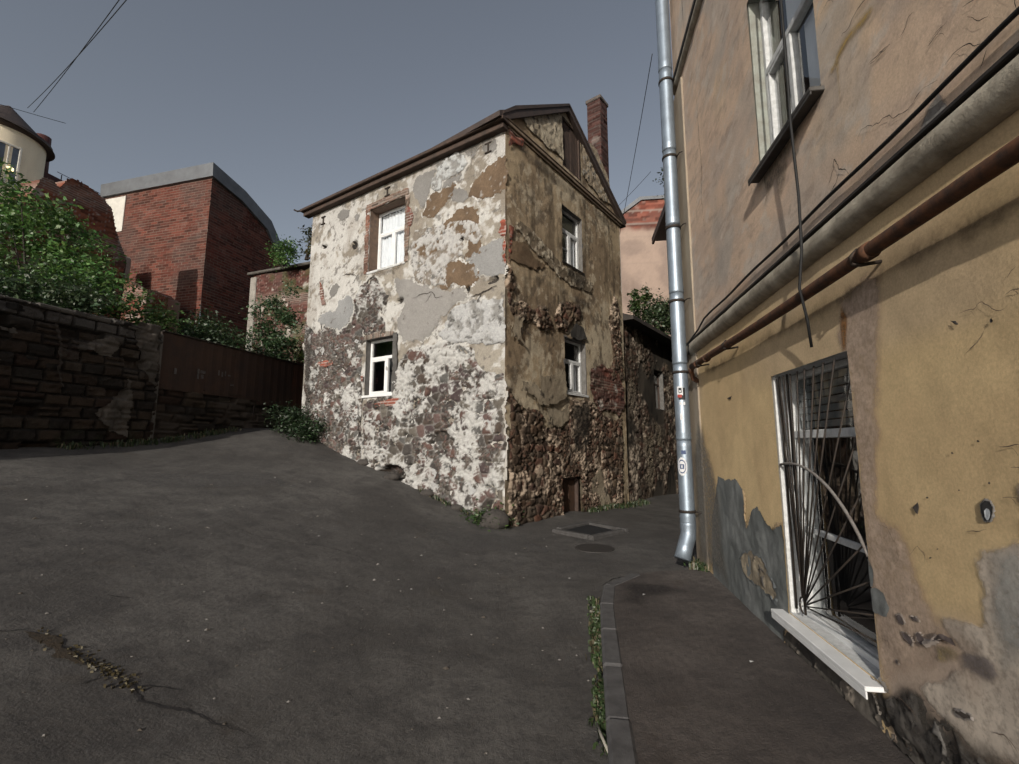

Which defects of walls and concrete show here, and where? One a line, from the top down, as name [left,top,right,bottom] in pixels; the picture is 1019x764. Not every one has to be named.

crack [927,0,990,68]
spalling [302,113,625,527]
spalling [740,549,778,607]
peeling [783,278,1019,764]